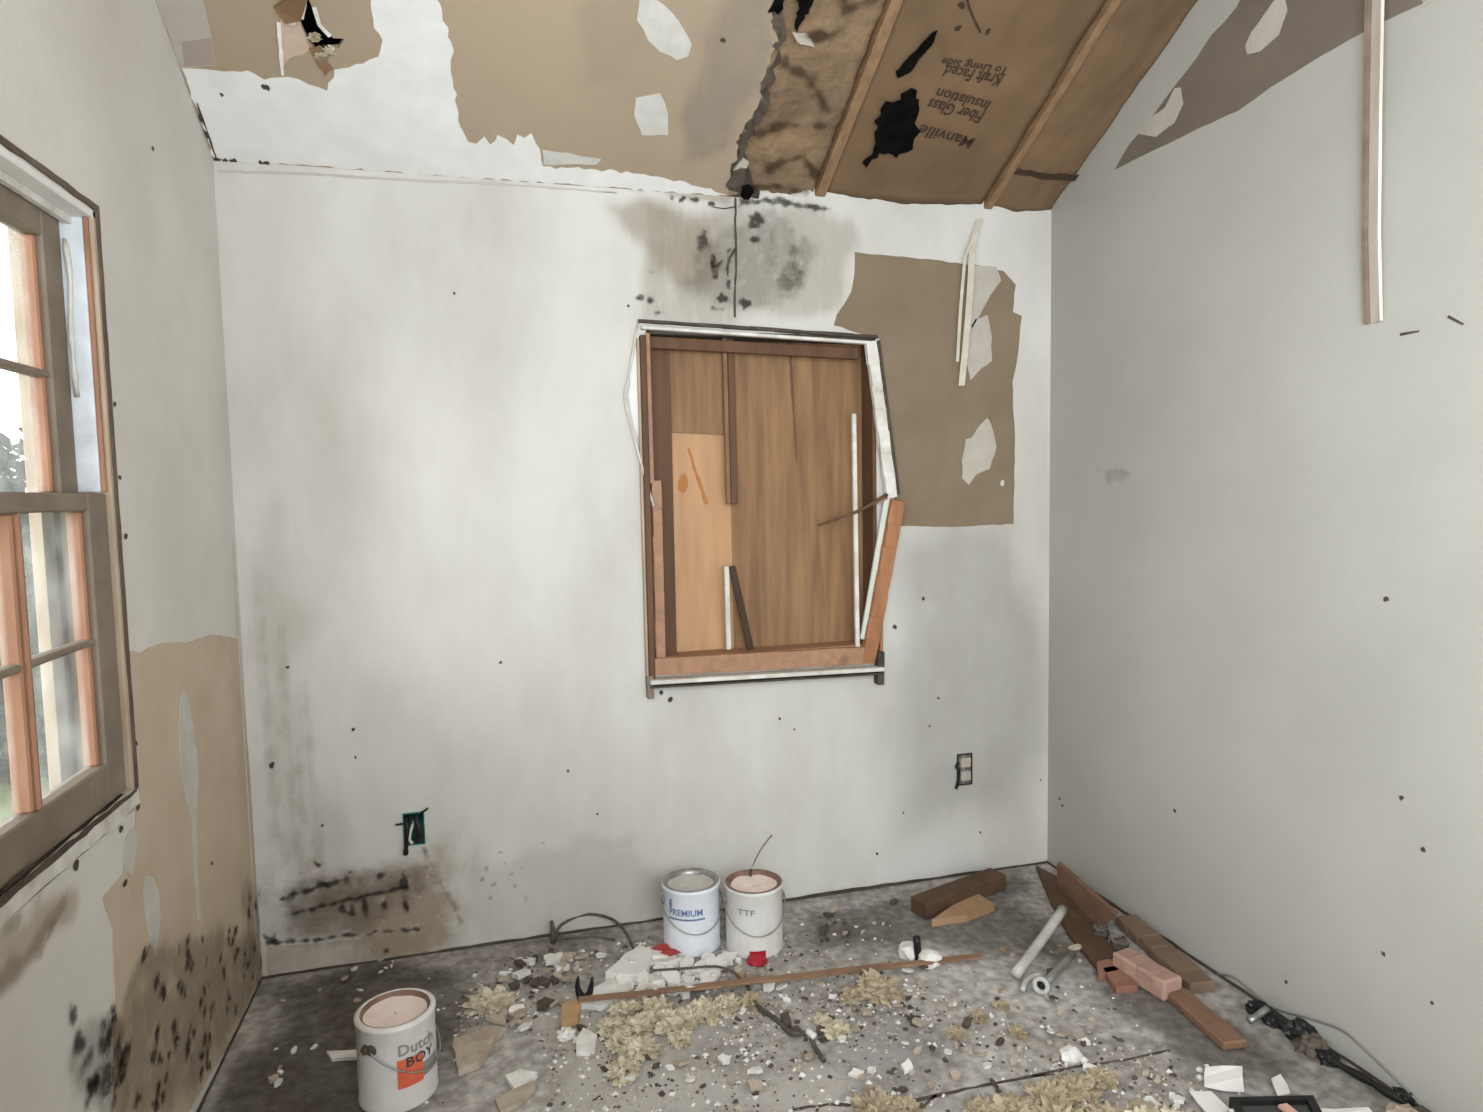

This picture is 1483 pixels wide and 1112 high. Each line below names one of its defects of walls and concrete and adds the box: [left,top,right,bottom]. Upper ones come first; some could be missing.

spalling [273,0,339,76]
peeling [768,0,784,14]
peeling [752,110,763,126]
peeling [1115,0,1423,169]
peeling [726,157,754,200]
damp [740,197,826,242]
damp [698,230,751,308]
peeling [834,252,1022,527]
peeling [102,634,262,1112]
damp [136,863,456,1112]
damp [71,1007,131,1105]